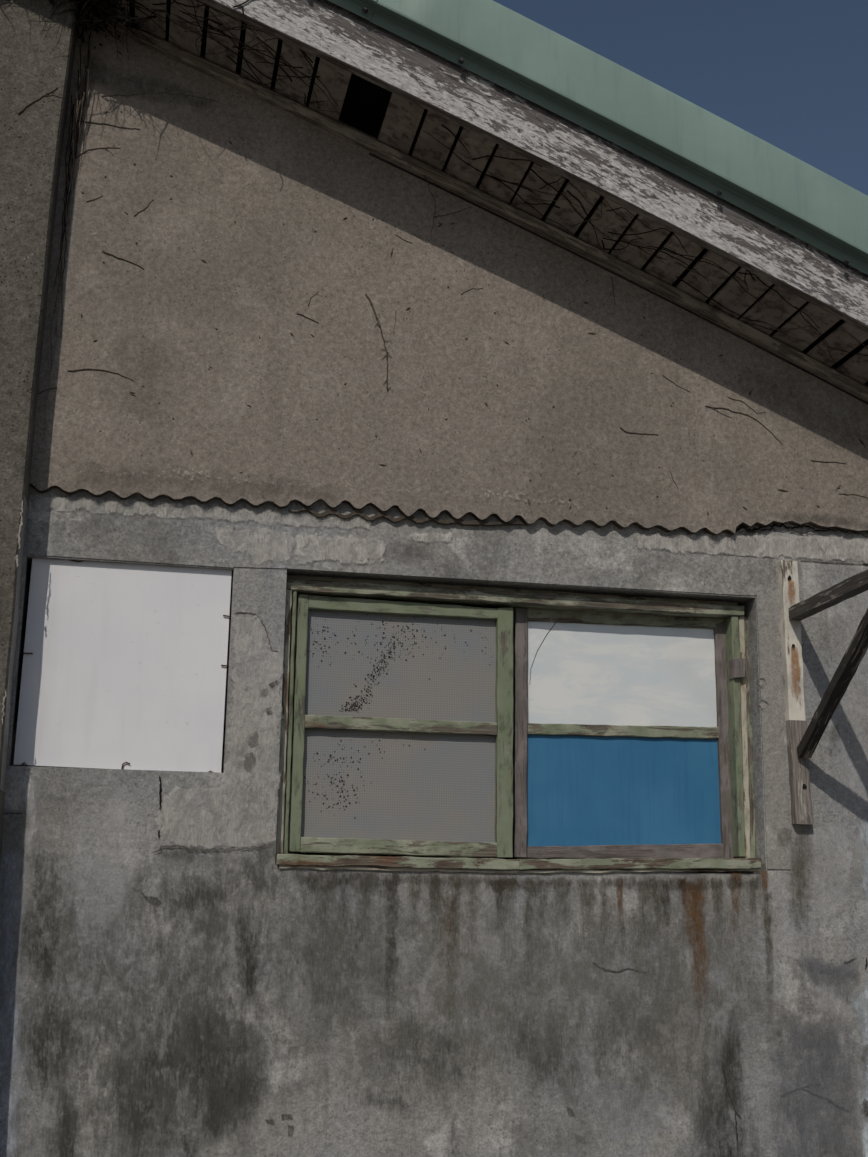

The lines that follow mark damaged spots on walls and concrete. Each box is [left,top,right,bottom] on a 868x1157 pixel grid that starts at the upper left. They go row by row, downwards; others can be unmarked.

crack [157,775,165,838]
water stain [411,874,568,921]
corrosion [678,879,706,983]
water stain [700,1032,745,1157]